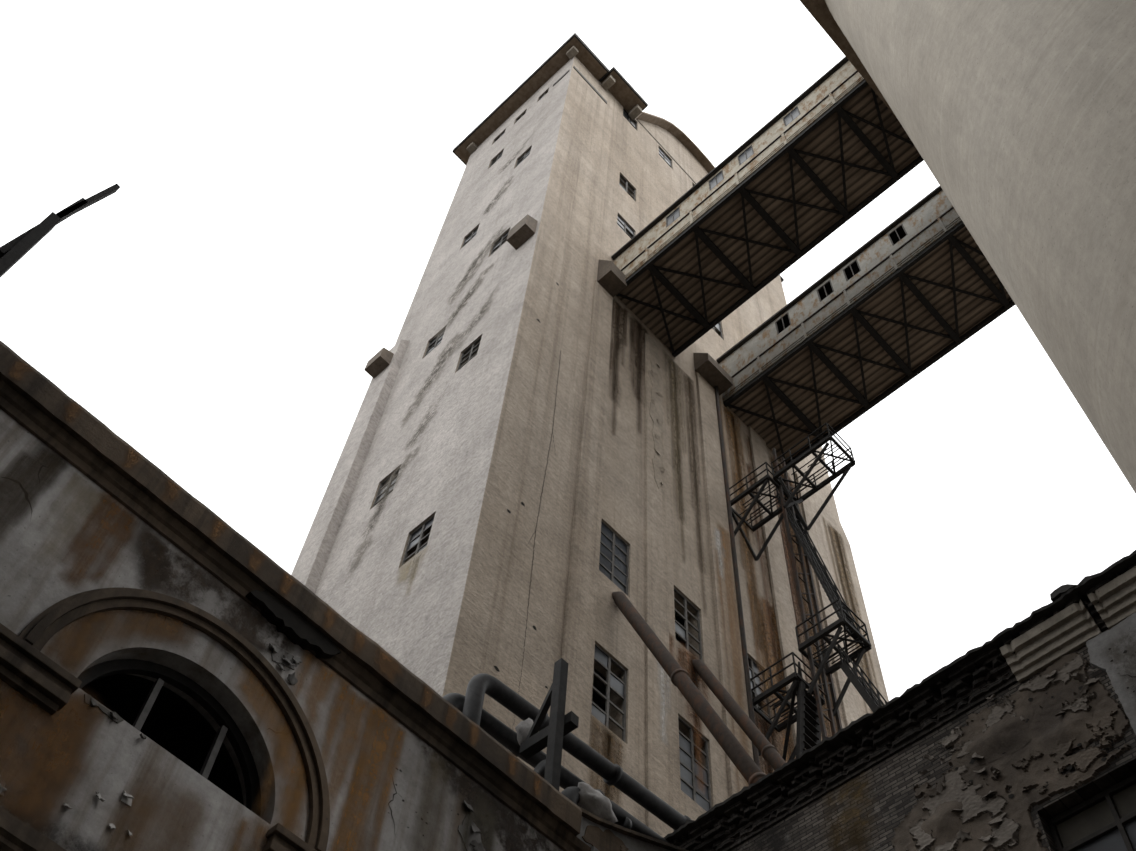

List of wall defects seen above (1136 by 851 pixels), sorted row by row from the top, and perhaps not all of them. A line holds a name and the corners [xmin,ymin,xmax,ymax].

corrosion [13,362,31,378]
leakage [610,299,626,434]
corrosion [126,448,140,467]
leakage [665,354,702,560]
corrosion [65,496,136,584]
corrosion [212,520,226,537]
corrosion [282,574,294,593]
corrosion [717,403,795,763]
corrosion [770,457,838,737]
corrosion [379,650,399,675]
peeling [906,655,1119,851]